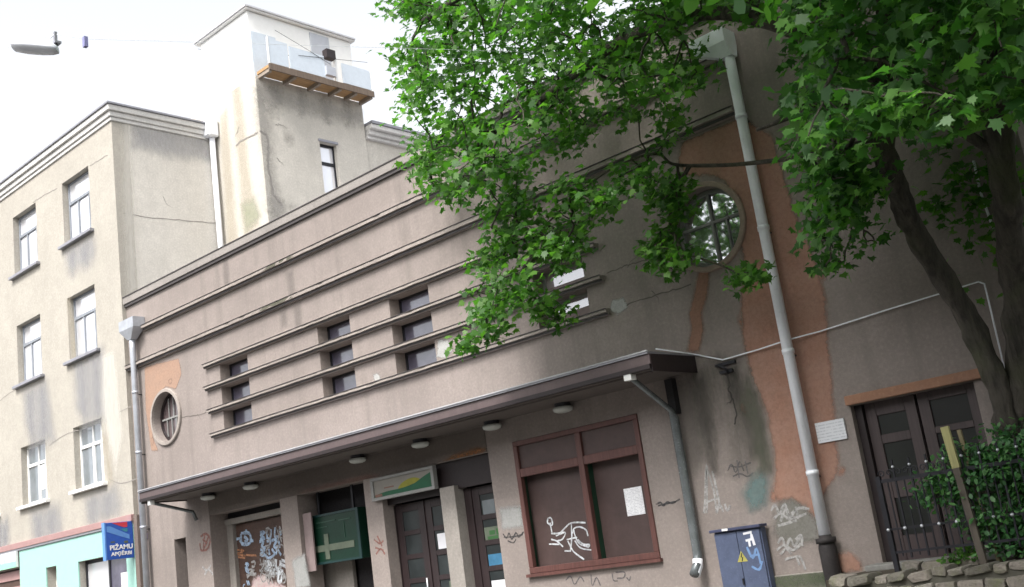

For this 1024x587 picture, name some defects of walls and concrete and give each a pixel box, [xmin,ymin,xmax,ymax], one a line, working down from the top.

crack [123,197,216,223]
crack [235,123,286,205]
peeling [679,120,845,545]
peeling [145,359,181,451]